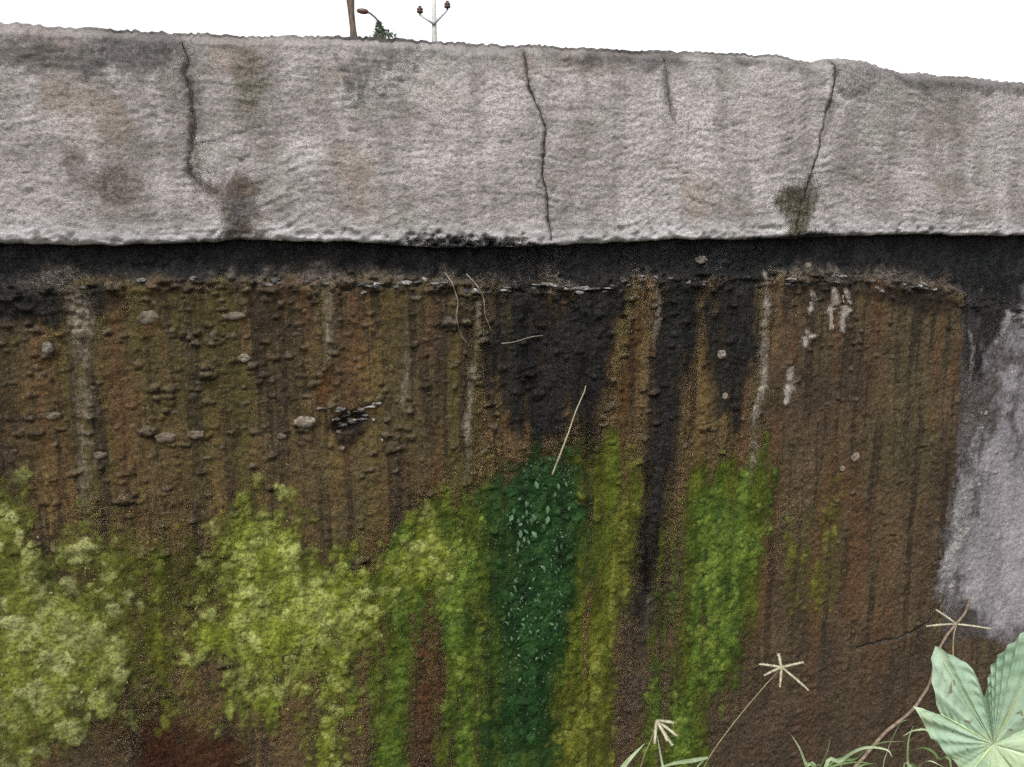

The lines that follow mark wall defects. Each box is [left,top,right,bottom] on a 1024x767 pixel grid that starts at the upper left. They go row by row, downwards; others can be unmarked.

crack [166,44,264,182]
crack [518,50,552,239]
crack [795,62,876,233]
water stain [0,181,1024,657]